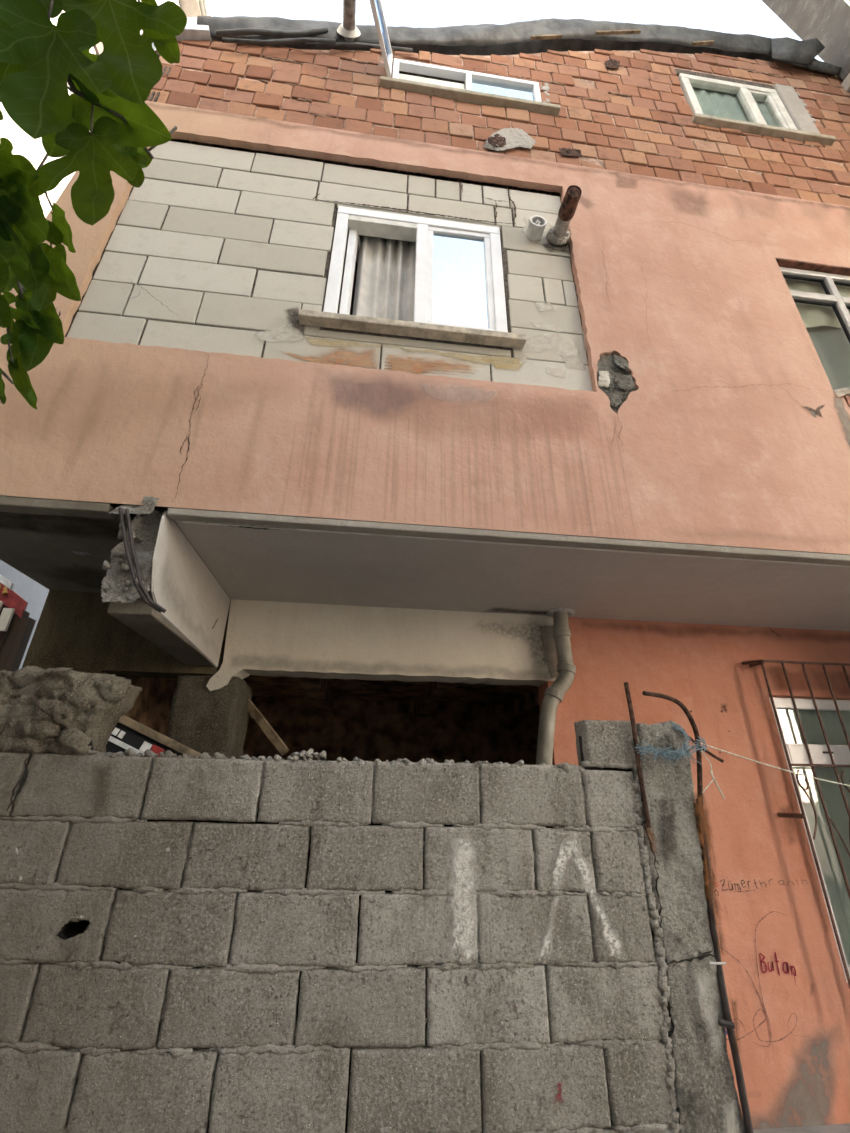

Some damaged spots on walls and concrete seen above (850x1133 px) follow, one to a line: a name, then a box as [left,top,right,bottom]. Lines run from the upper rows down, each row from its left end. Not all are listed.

crack [172,355,209,502]
corrosion [287,349,469,374]
spalling [596,354,637,413]
spalling [101,496,166,613]
crack [641,798,716,966]
crack [667,1001,675,1037]